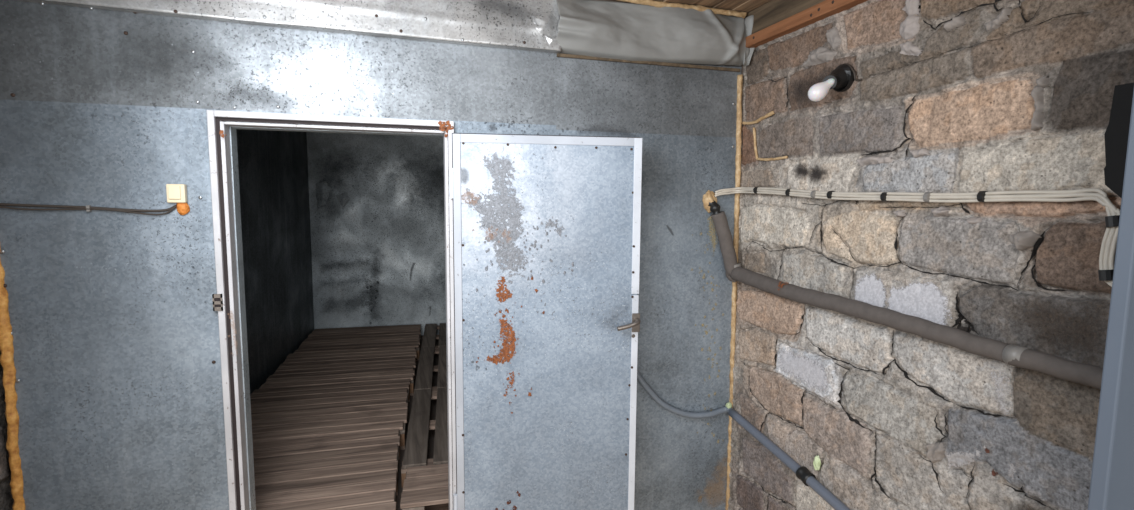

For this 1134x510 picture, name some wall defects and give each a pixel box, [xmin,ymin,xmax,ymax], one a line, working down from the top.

rust [438,120,454,138]
peeling [461,152,566,284]
rust [476,276,532,413]